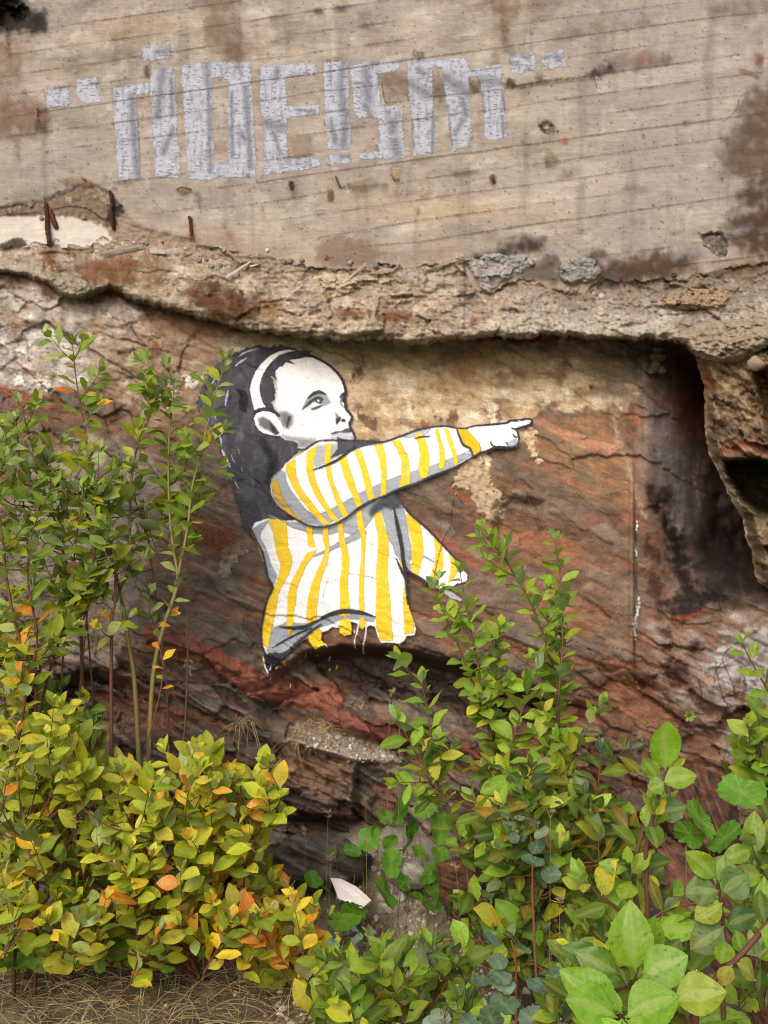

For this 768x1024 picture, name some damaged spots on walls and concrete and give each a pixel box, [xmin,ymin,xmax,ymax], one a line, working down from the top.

water stain [0,0,46,56]
spalling [2,200,44,220]
spalling [55,177,106,222]
water stain [724,87,768,272]
spalling [0,237,59,249]
rust [42,202,60,273]
spalling [698,231,728,256]
spalling [312,251,391,290]
spalling [463,252,536,294]
spalling [558,256,603,285]